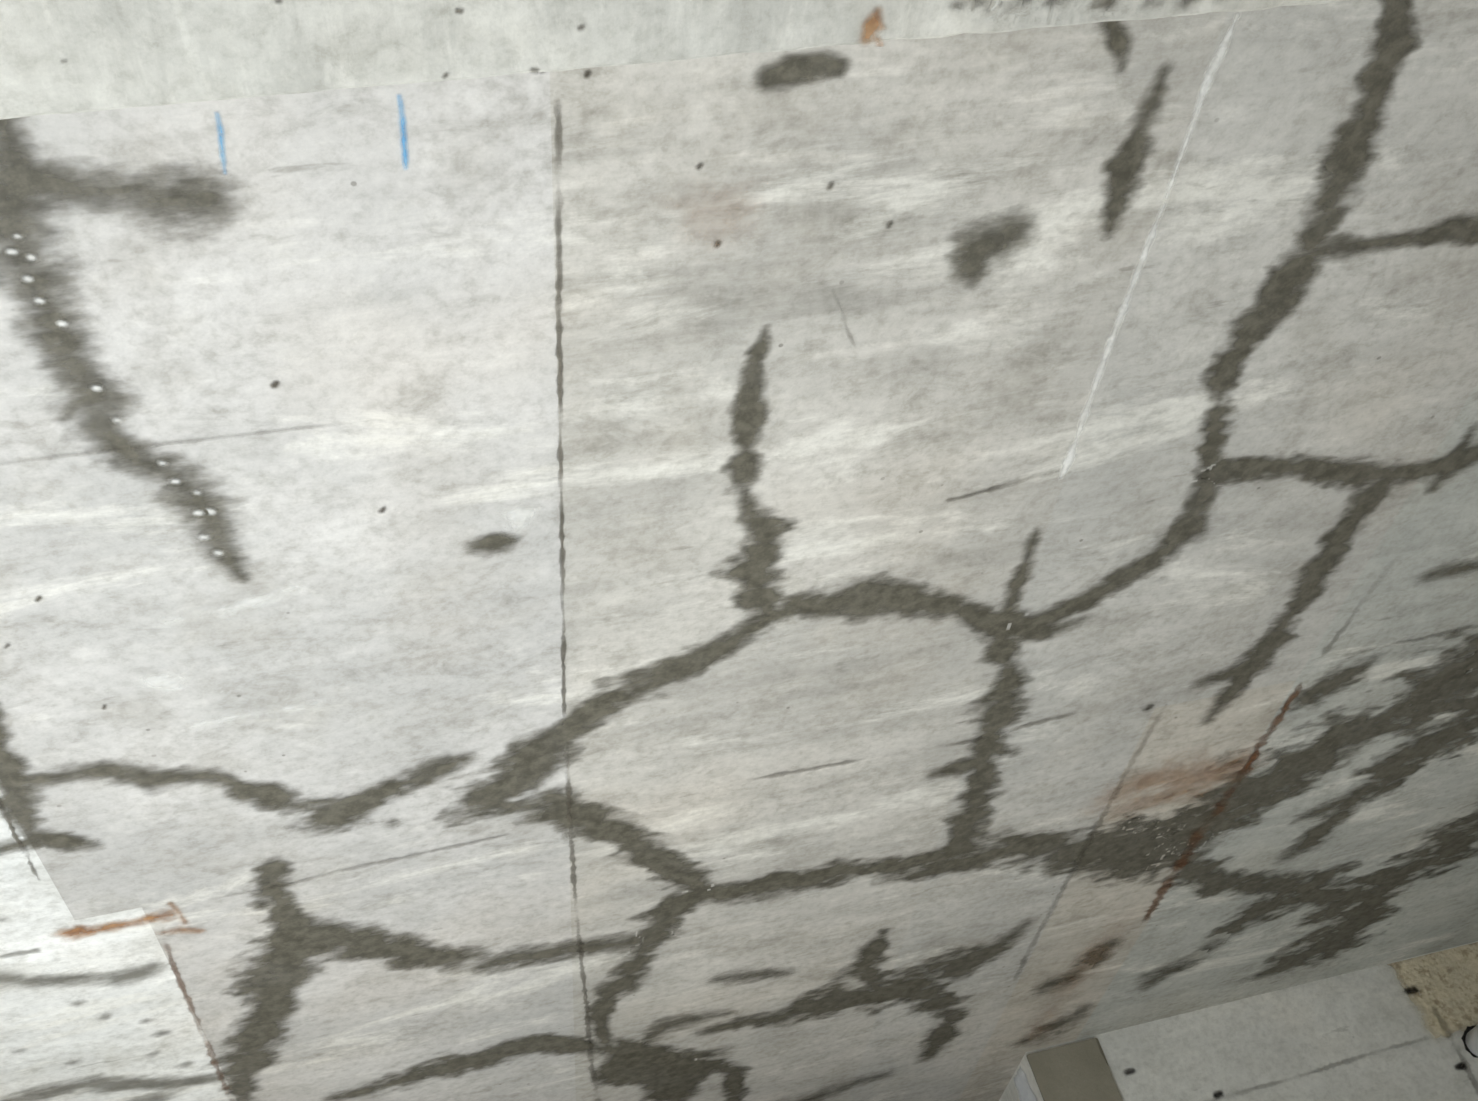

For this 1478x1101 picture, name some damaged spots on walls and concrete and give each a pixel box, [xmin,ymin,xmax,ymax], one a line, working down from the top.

corrosion [61,903,200,937]
water stain [327,0,1478,1101]